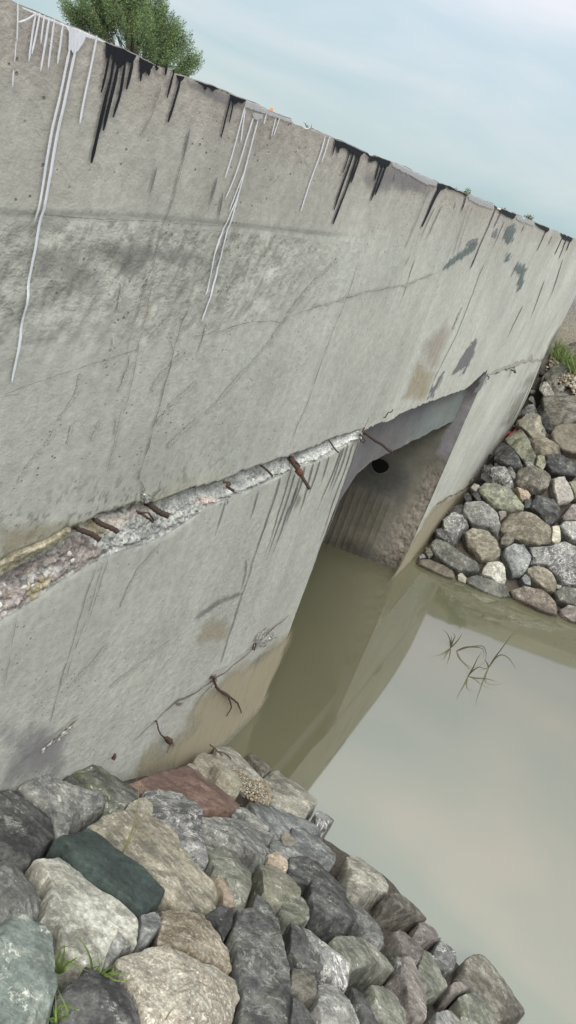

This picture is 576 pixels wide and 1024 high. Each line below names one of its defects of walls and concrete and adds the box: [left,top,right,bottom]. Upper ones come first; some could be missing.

water stain [79,35,98,123]
water stain [90,55,194,163]
water stain [12,2,76,382]
water stain [202,89,280,321]
water stain [301,136,473,253]
crack [138,256,433,498]
crack [435,265,484,378]
water stain [509,229,571,334]
spalling [0,430,393,620]
water stain [255,441,359,556]